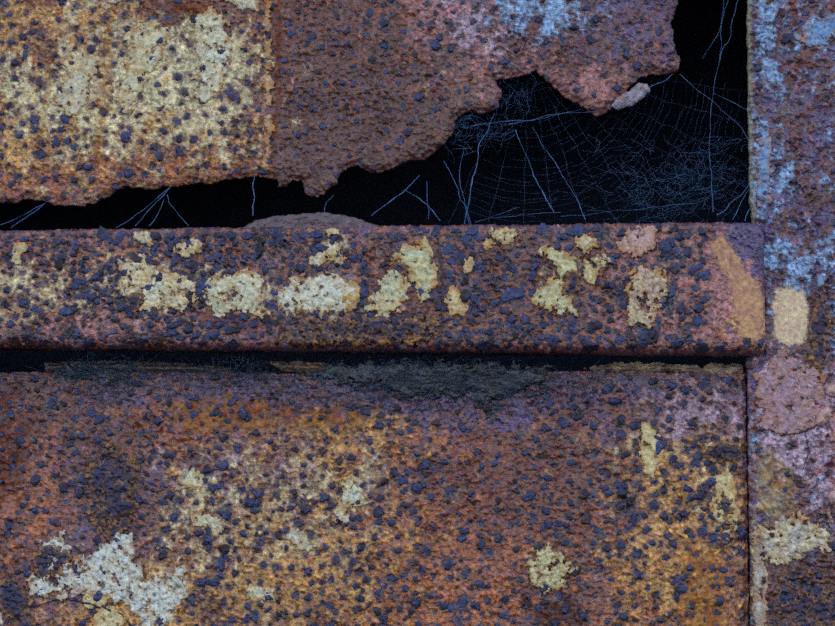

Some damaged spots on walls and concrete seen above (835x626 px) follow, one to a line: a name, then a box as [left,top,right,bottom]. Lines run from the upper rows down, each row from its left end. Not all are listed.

corrosion [0,98,95,200]
corrosion [0,14,130,92]
peeling [55,52,98,117]
corrosion [86,65,144,148]
peeling [115,19,174,115]
peeling [189,6,232,103]
corrosion [208,88,262,172]
peeling [225,0,260,13]
corrosion [222,0,368,124]
corrosion [611,40,652,110]
corrosion [0,212,725,354]
corrosion [0,372,748,626]